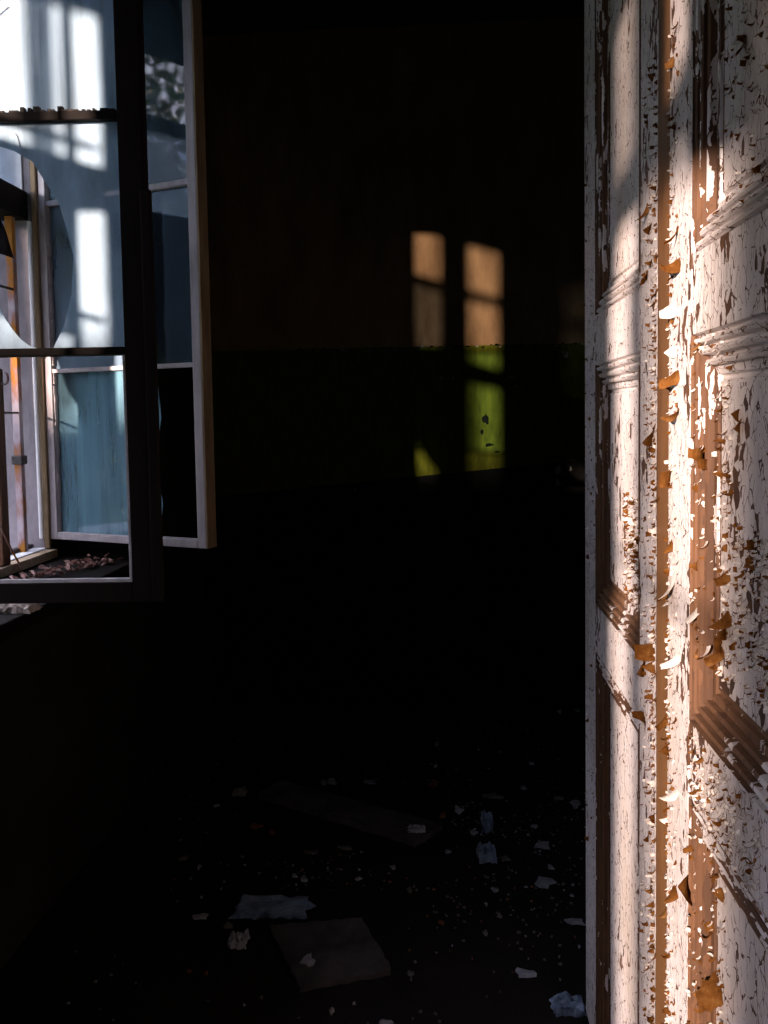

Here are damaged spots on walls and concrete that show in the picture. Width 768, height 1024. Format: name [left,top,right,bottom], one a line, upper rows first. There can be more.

peeling [621,0,768,1024]